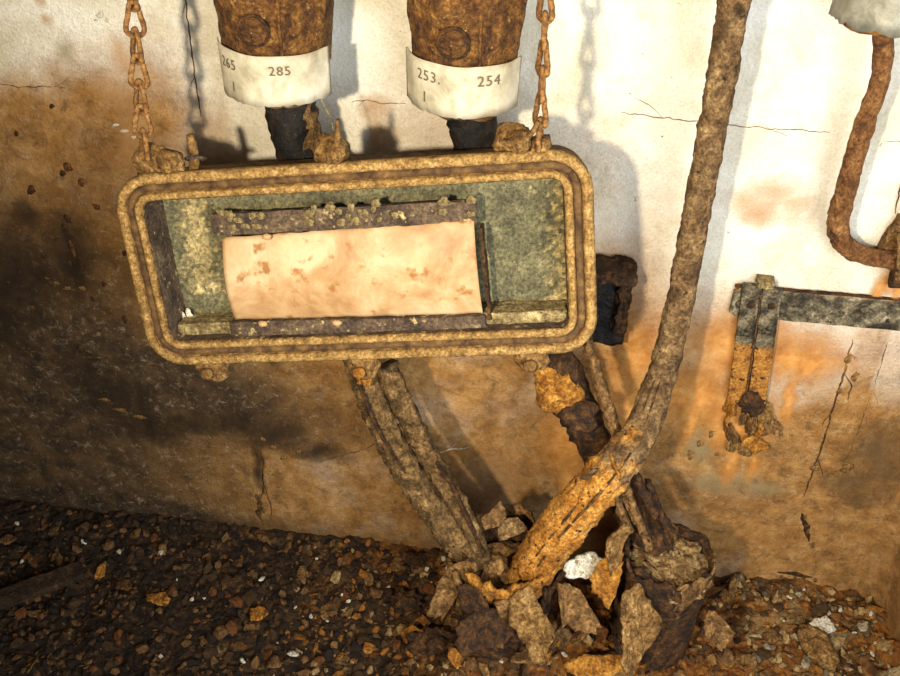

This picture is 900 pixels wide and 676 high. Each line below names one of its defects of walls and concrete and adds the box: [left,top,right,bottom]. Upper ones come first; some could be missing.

crack [253,447,272,523]
damp [301,446,330,460]
corrosion [670,325,750,477]
corrosion [772,345,841,423]
crack [803,340,887,497]